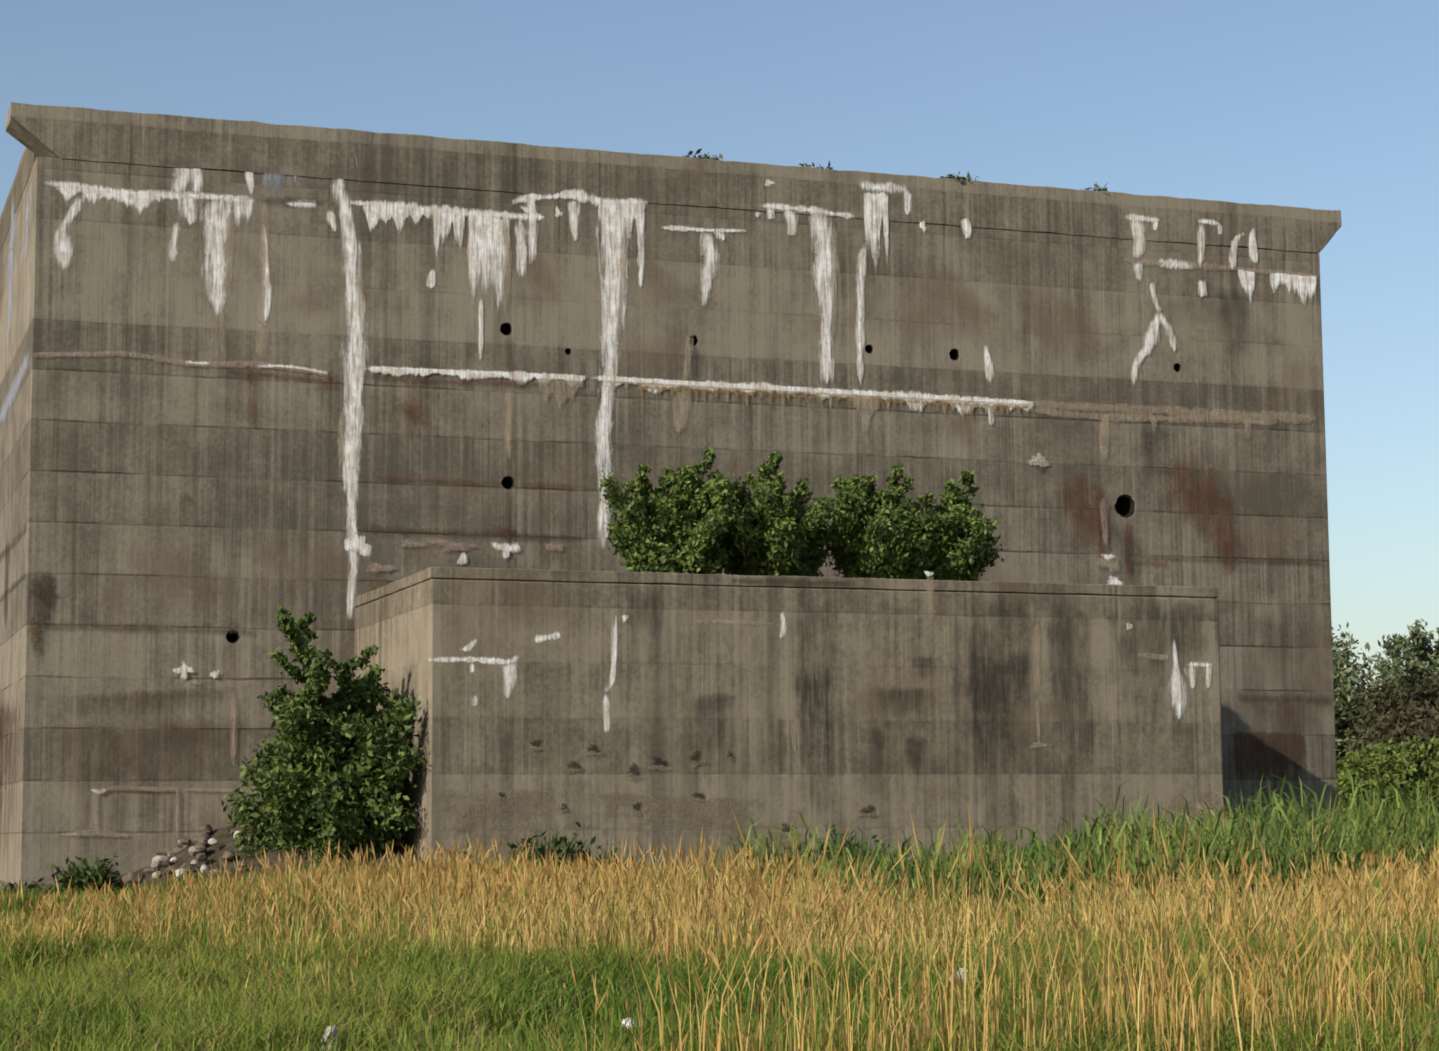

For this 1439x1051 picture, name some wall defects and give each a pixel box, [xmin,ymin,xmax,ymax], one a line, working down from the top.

water stain [0,168,327,421]
water stain [327,179,1317,616]
water stain [1147,612,1211,719]